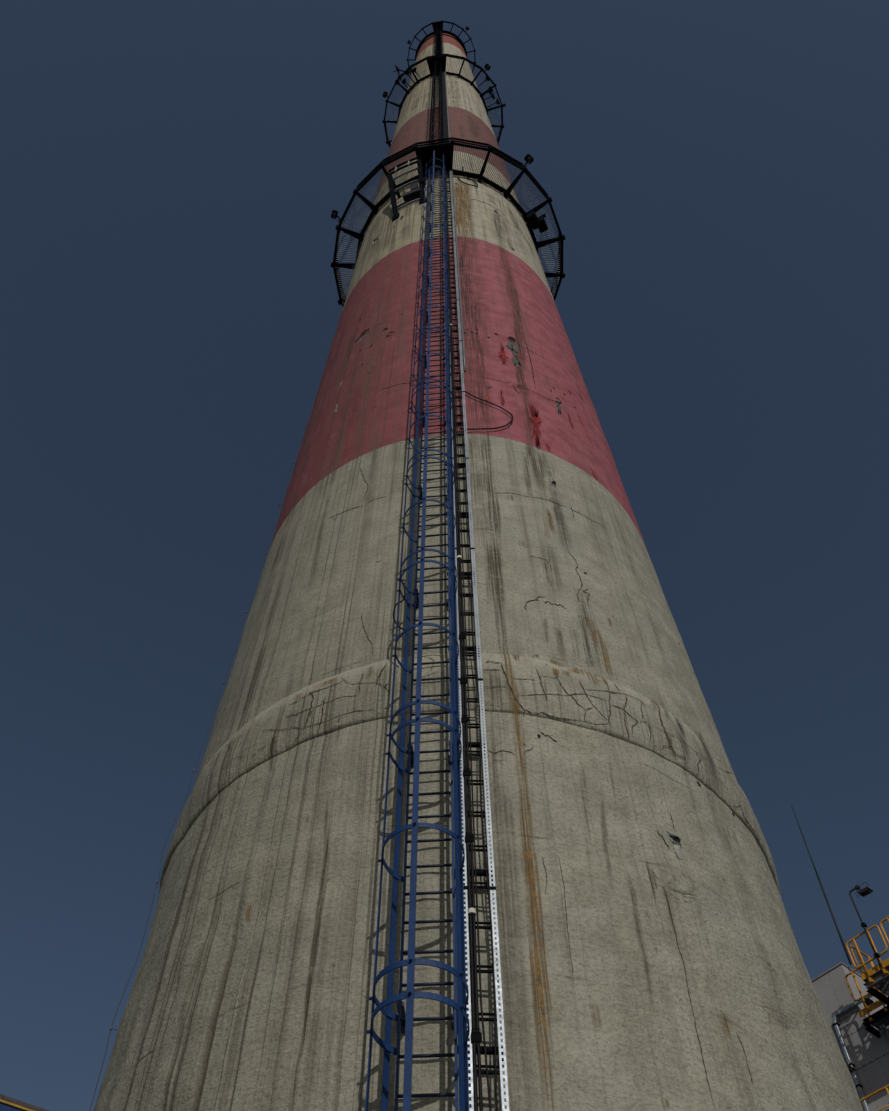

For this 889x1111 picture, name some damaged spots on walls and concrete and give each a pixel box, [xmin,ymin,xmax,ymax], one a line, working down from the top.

peeling [529,407,550,451]
crack [524,554,590,610]
crack [484,660,732,774]
corrosion [503,653,551,1076]
spalling [664,831,683,859]